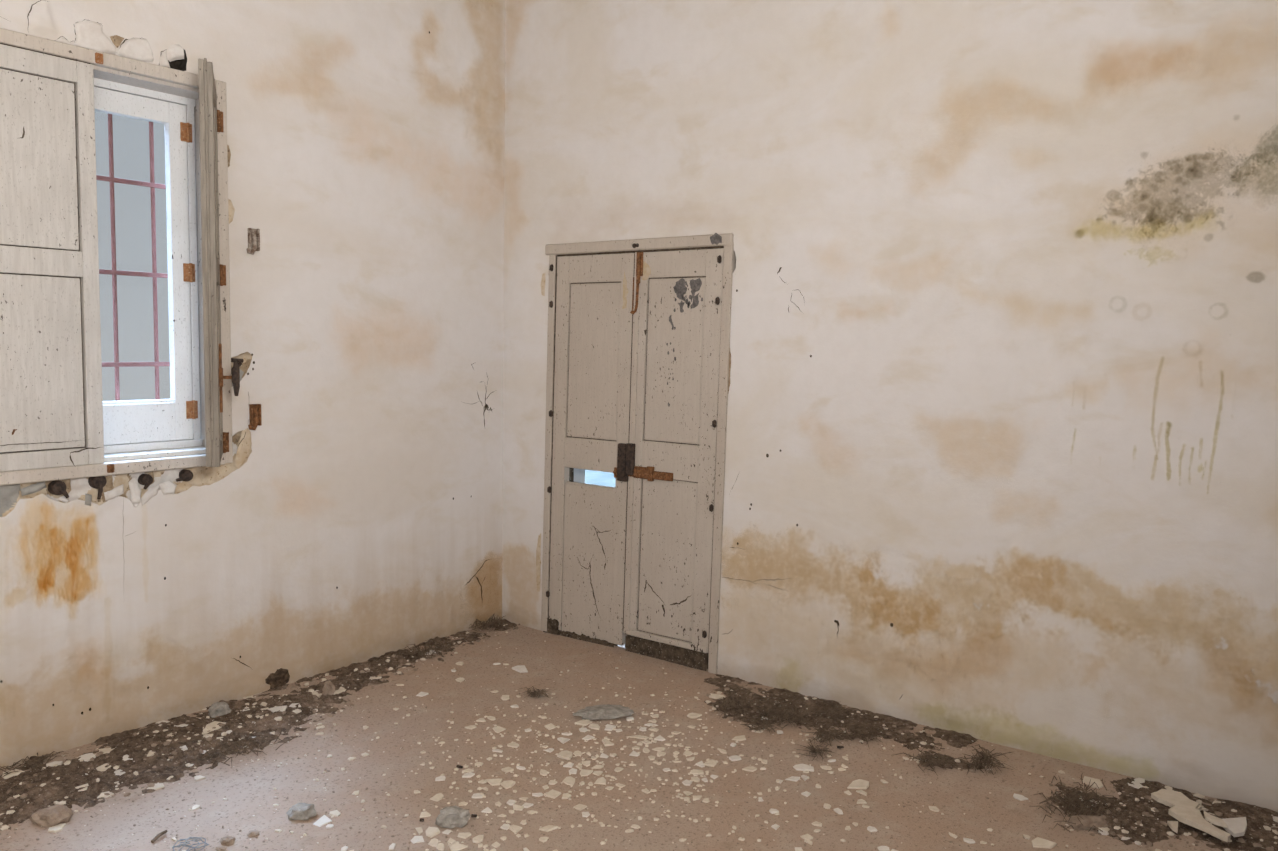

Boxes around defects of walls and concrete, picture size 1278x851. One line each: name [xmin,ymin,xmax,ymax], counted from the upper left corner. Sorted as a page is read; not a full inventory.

flaking render [54,19,187,71]
spalling [0,430,252,517]